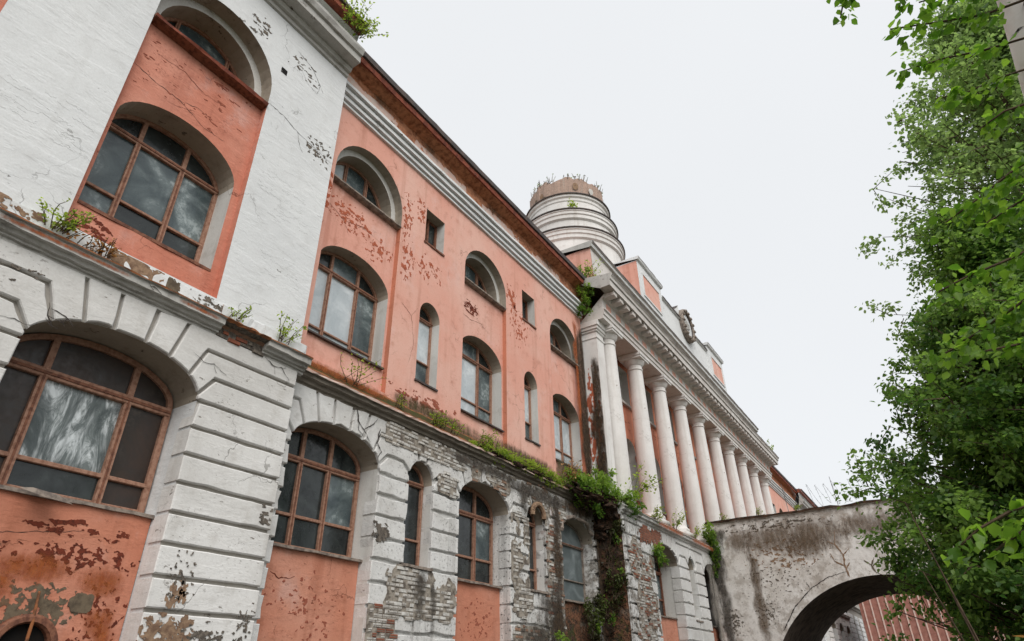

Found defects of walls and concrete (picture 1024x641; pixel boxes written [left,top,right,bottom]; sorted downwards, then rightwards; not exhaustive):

spalling [76,216,223,312]
peeling [306,135,442,287]
peeling [506,283,528,348]
damp [396,331,608,479]
peeling [0,518,140,641]
spalling [136,550,345,641]
spalling [364,421,567,641]
damp [596,538,607,641]
spalling [628,524,663,641]
damp [707,513,907,641]